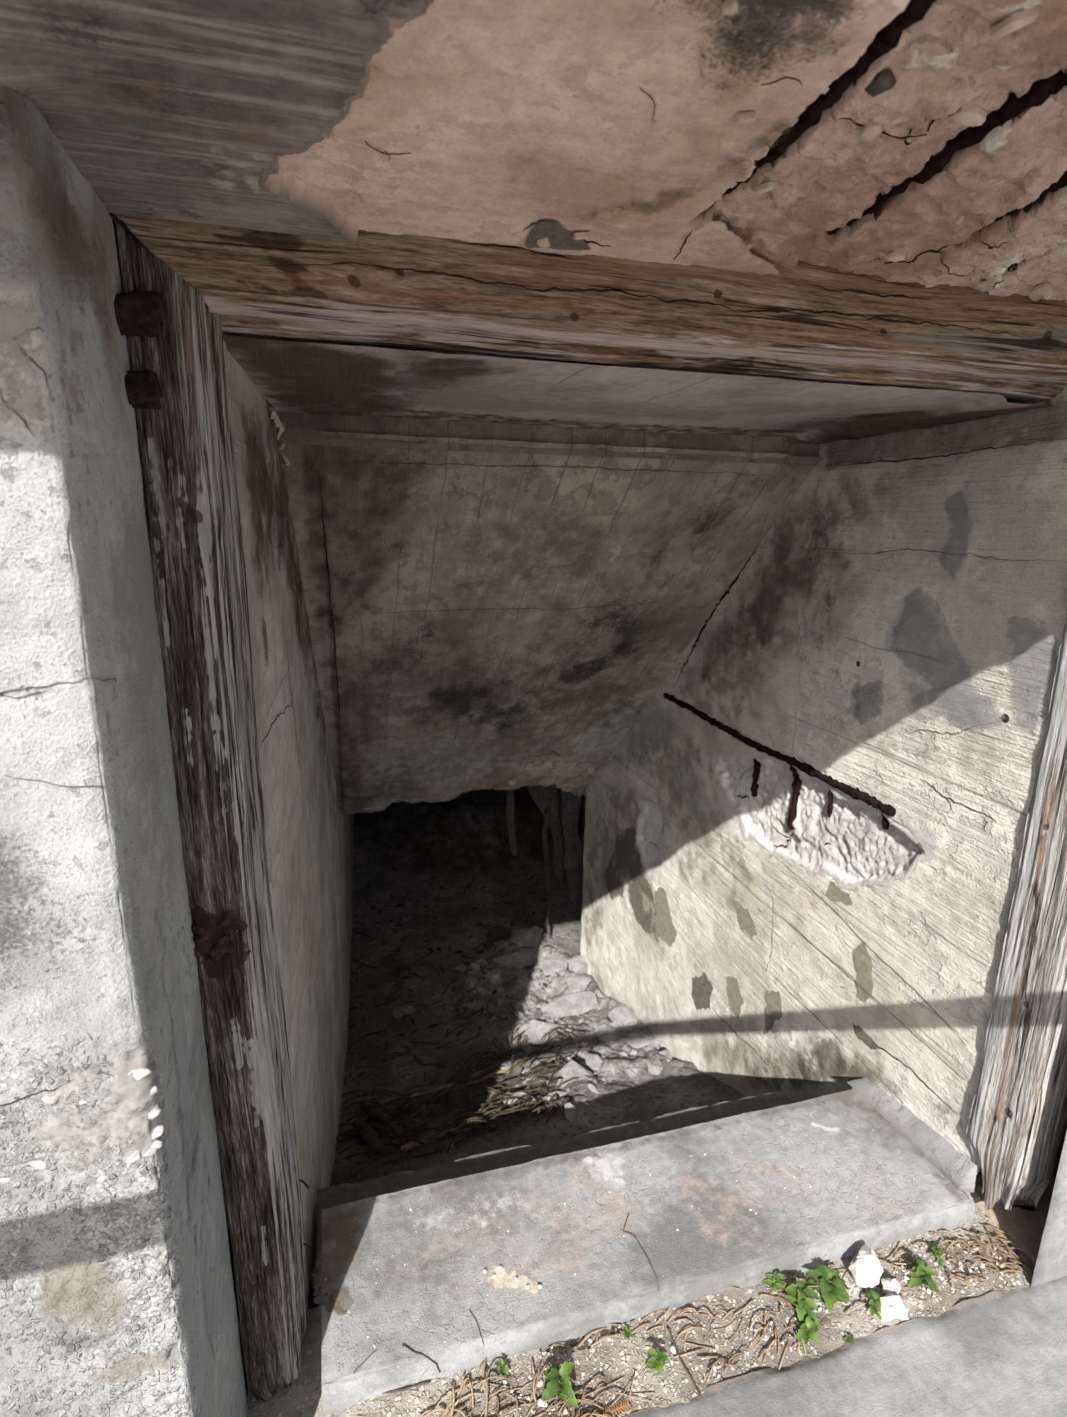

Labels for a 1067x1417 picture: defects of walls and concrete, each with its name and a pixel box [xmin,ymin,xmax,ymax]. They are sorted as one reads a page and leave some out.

peeling [258,0,1067,303]
damp [699,0,863,89]
crack [761,77,803,86]
crack [833,107,962,145]
crack [874,229,1018,289]
damp [227,341,483,414]
crack [0,676,117,698]
damp [410,597,656,736]
spalling [663,693,939,906]
damp [0,839,86,962]